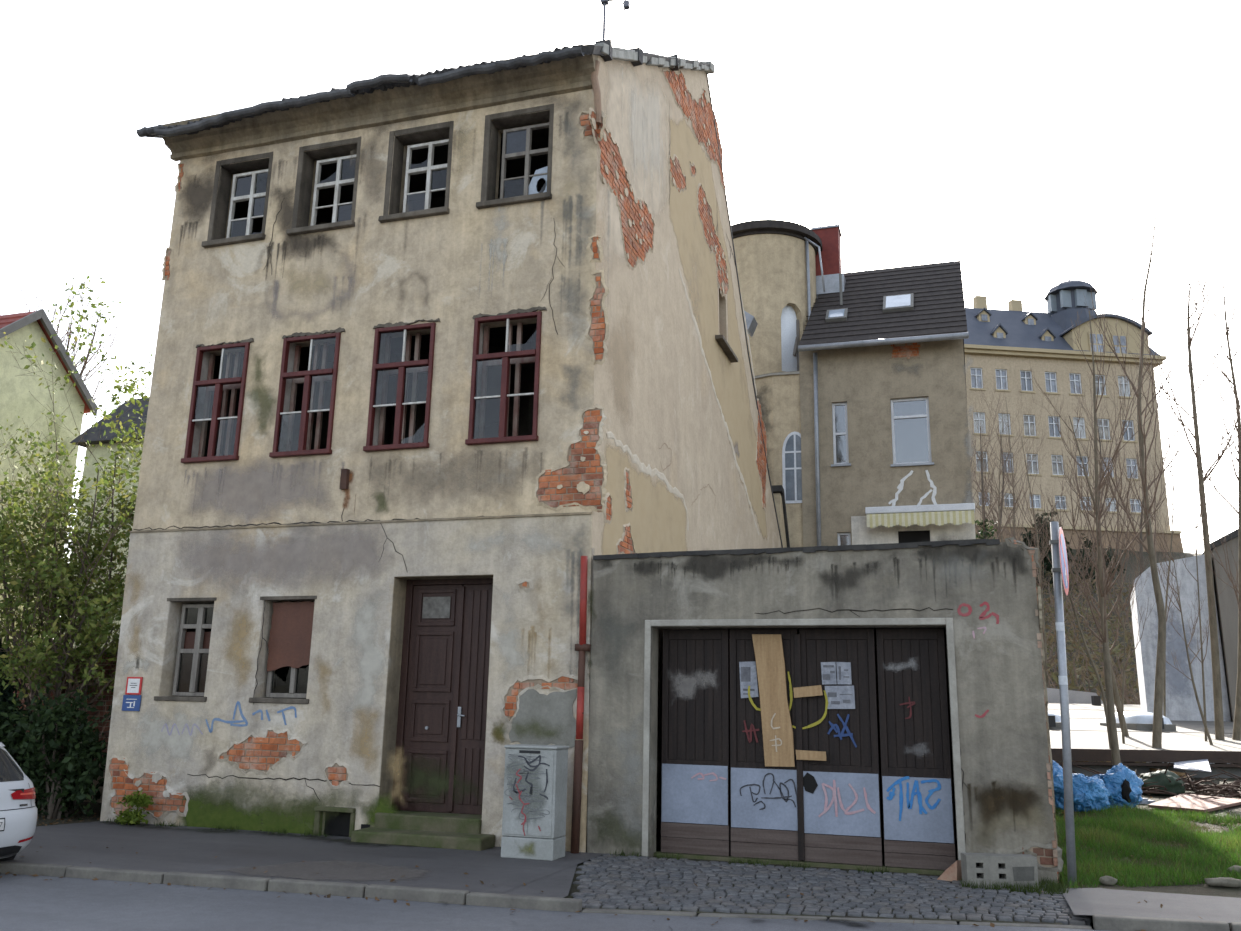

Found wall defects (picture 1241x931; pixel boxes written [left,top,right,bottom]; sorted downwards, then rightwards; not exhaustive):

flaking render [662,54,726,193]
water stain [180,178,214,240]
crack [542,221,564,335]
flaking render [584,235,609,365]
flaking render [576,107,655,270]
flaking render [668,154,729,298]
flaking render [532,404,635,554]
water stain [634,554,801,578]
water stain [822,563,877,586]
flaking render [107,754,190,821]
flaking render [217,727,307,776]
water stain [968,782,1037,821]